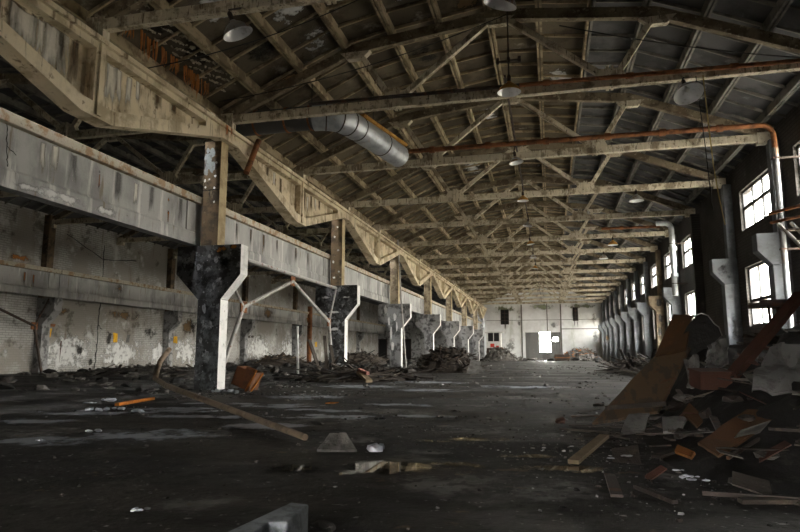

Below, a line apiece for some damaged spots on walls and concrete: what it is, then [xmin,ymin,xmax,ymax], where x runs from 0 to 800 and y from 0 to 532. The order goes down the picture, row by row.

rust [122,29,209,98]
peeling [203,148,217,189]
crack [93,303,101,369]
peeling [47,336,163,370]
peeling [175,338,209,367]
peeling [247,336,302,361]